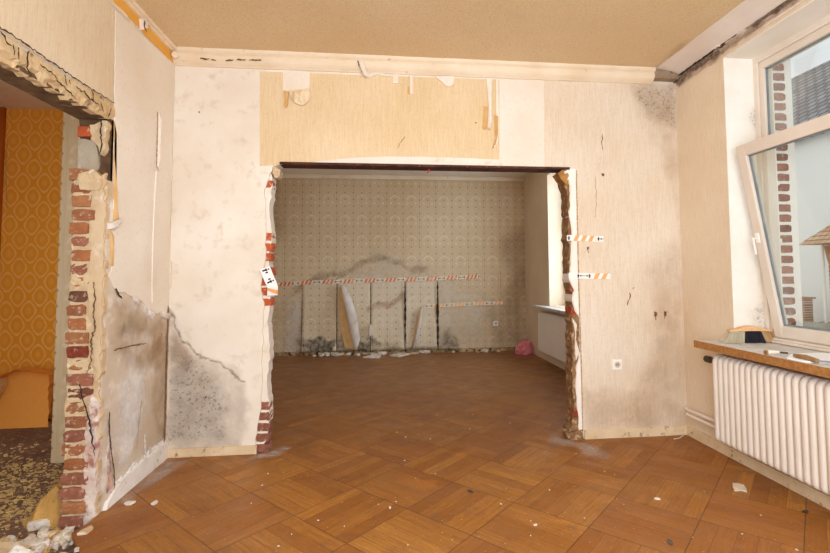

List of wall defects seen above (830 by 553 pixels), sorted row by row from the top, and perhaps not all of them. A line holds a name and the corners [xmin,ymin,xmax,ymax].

damp [674,0,797,85]
peeling [283,72,311,108]
crack [87,282,96,372]